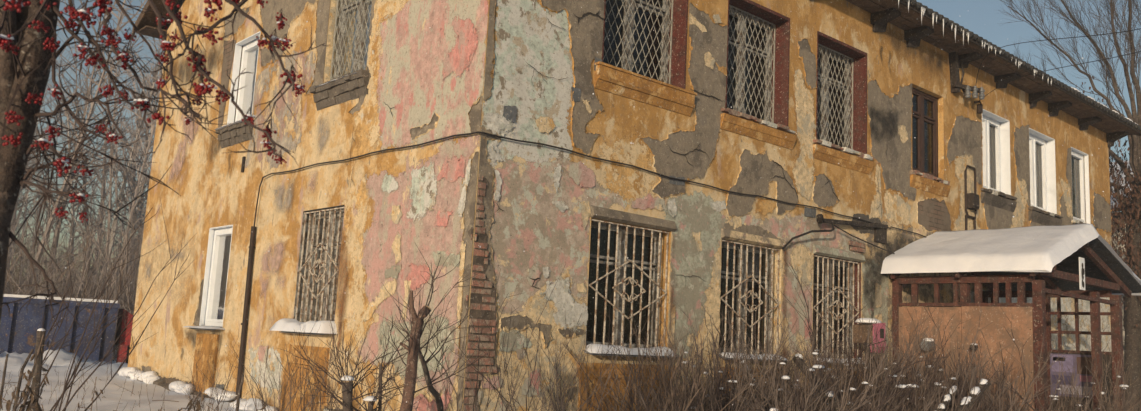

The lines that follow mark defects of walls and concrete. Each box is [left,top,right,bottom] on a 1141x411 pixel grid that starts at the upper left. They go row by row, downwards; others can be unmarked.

peeling [323,0,1075,411]
peeling [1050,297,1112,352]